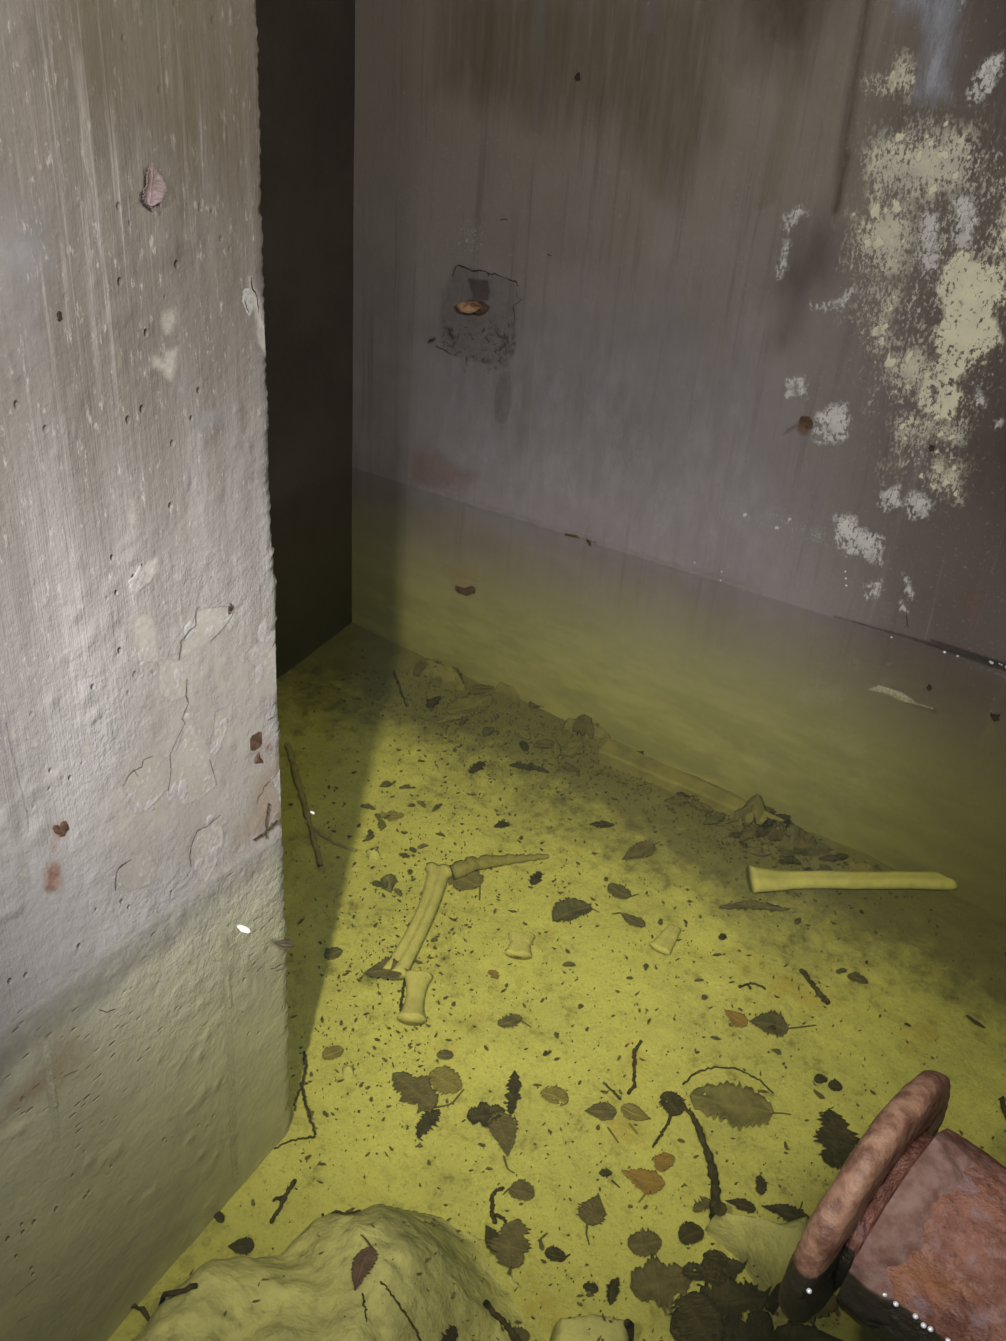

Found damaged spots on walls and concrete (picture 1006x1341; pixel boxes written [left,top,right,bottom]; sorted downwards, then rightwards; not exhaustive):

peeling [739,508,885,565]
peeling [864,582,881,599]
crack [124,606,233,788]